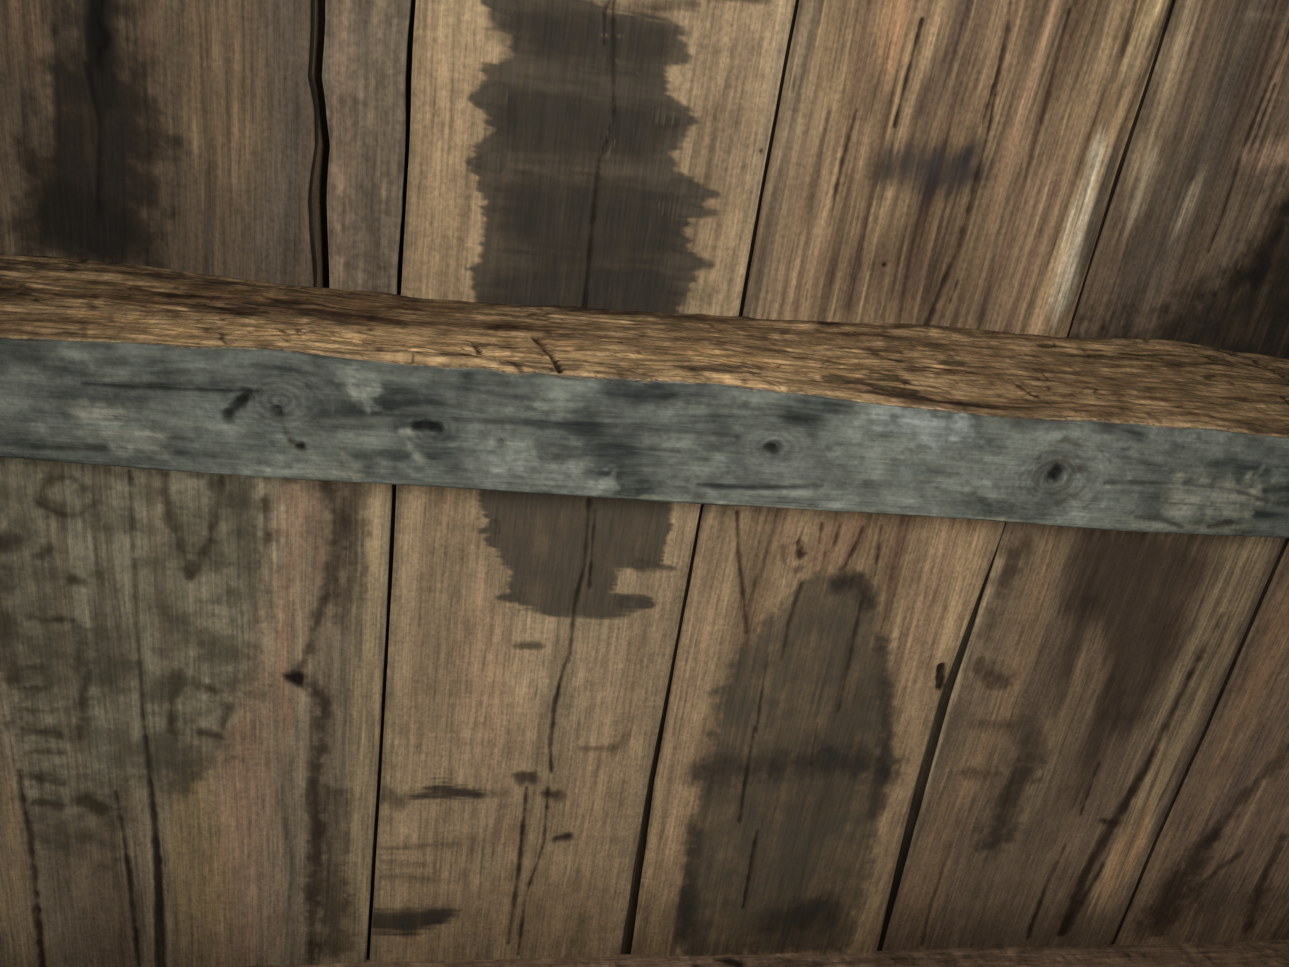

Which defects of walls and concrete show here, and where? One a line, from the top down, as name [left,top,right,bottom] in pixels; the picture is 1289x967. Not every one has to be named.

water stain [26,0,157,263]
water stain [467,0,719,314]
water stain [480,490,674,619]
water stain [679,577,891,955]